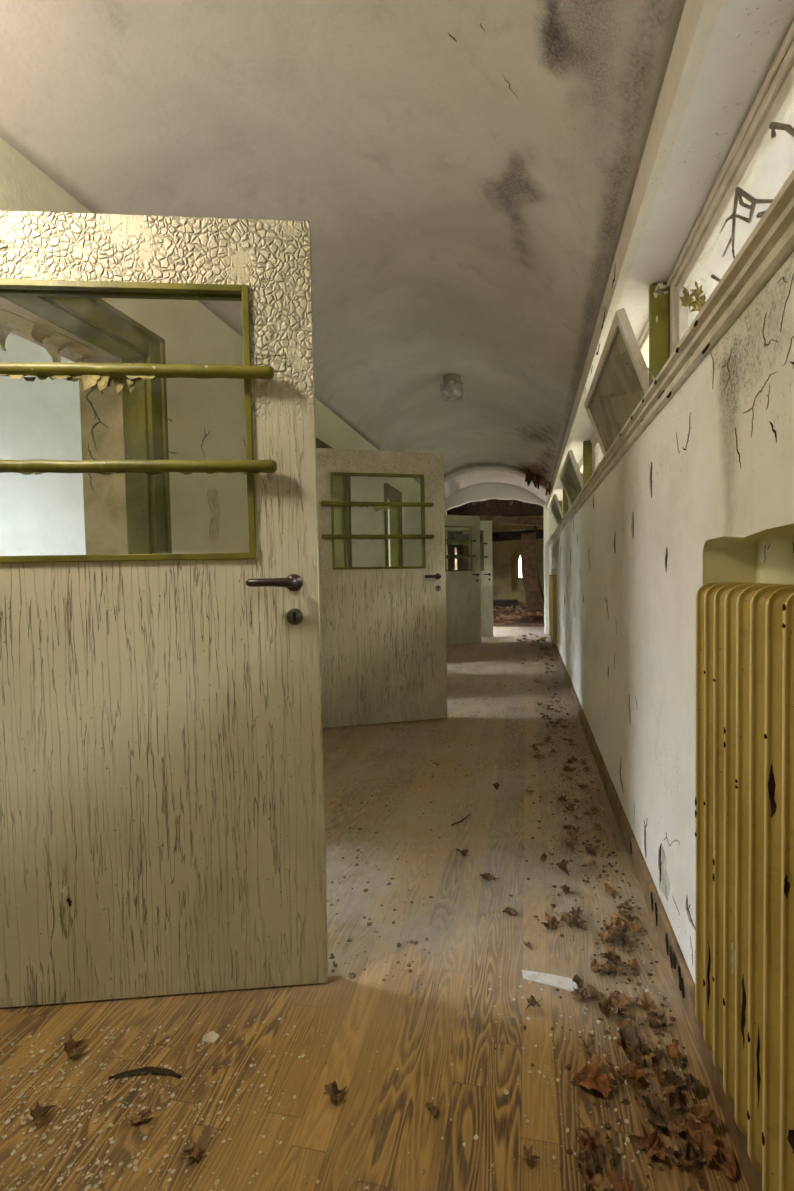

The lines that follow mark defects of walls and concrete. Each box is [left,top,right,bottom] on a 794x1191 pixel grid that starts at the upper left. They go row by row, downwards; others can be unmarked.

crack [710,350,732,390]
crack [735,273,794,466]
crack [676,412,691,453]